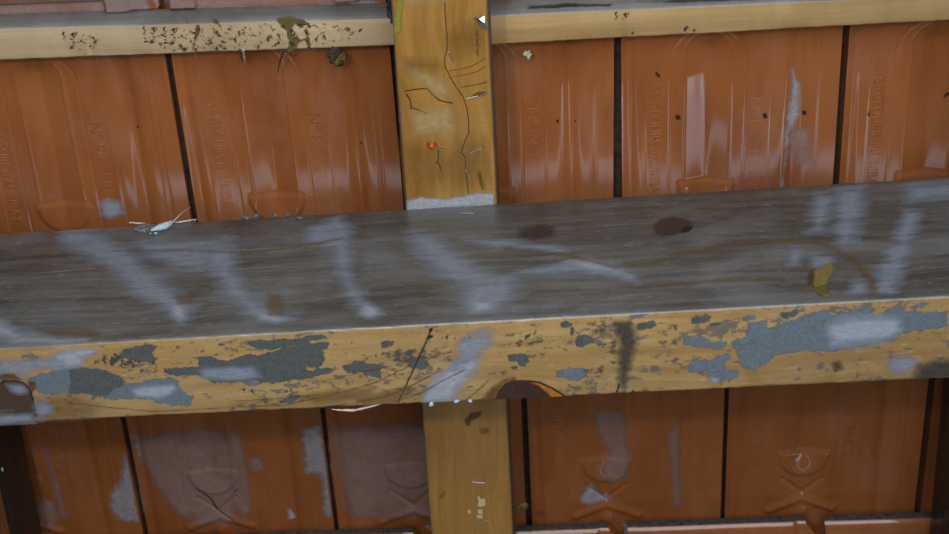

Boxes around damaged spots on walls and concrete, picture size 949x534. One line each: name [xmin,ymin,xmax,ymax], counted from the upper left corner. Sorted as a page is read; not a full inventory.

damp [142,23,362,52]
crack [404,1,487,194]
damp [62,230,285,322]
damp [412,230,636,314]
peeling [0,333,491,406]
crack [344,327,464,403]
peeling [502,324,547,373]
peeling [561,321,611,348]
peeling [668,302,948,382]
damp [110,456,144,524]
damp [135,430,263,524]
crack [195,488,238,521]